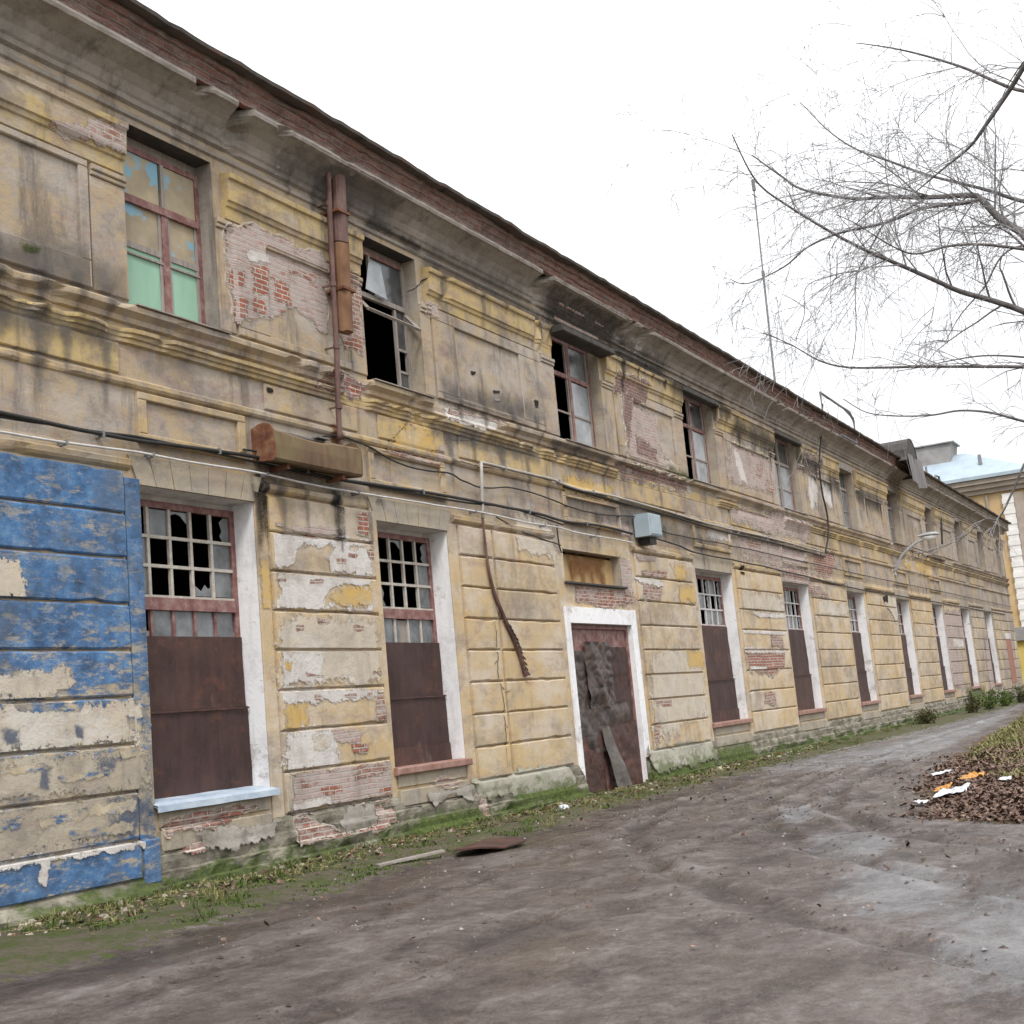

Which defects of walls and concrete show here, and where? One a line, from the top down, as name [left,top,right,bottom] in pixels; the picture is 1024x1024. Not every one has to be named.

flaking render [49,117,128,155]
flaking render [222,221,365,356]
flaking render [612,369,693,496]
peeling [0,556,28,600]
peeling [267,510,387,723]
flaking render [573,554,667,611]
flaking render [706,440,849,707]
peeling [0,663,260,887]
rust [147,636,253,799]
flaking render [279,722,399,847]